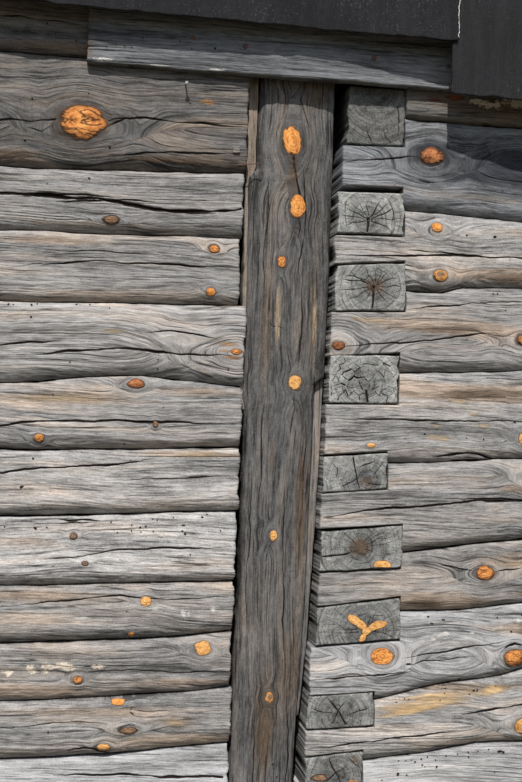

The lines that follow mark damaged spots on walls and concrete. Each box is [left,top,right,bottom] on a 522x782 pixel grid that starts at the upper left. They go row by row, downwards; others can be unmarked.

crack [0,118,55,132]
crack [108,116,246,128]
crack [116,149,232,157]
crack [0,192,241,214]
crack [345,200,397,232]
crack [293,158,307,367]
crack [331,333,522,422]
crack [436,452,493,462]
crack [333,458,382,491]
crack [282,399,307,650]
crack [322,498,522,561]
crack [311,642,522,781]